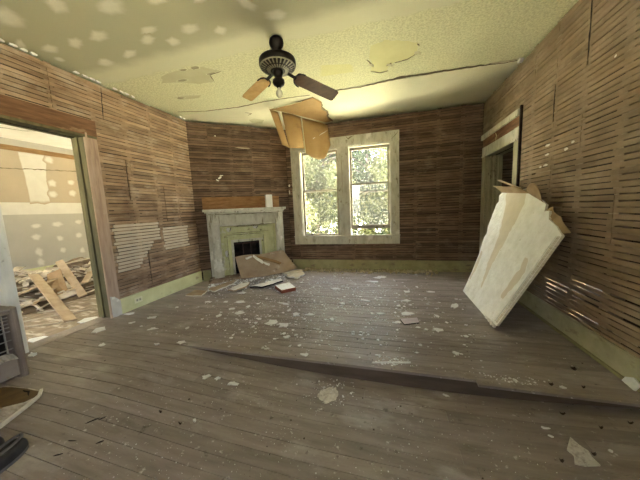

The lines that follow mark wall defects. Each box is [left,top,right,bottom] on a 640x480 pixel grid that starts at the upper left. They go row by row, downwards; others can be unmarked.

flaking render [367,38,421,73]
flaking render [158,66,221,85]
crack [337,60,518,91]
crack [183,95,309,112]
peeling [468,189,529,289]